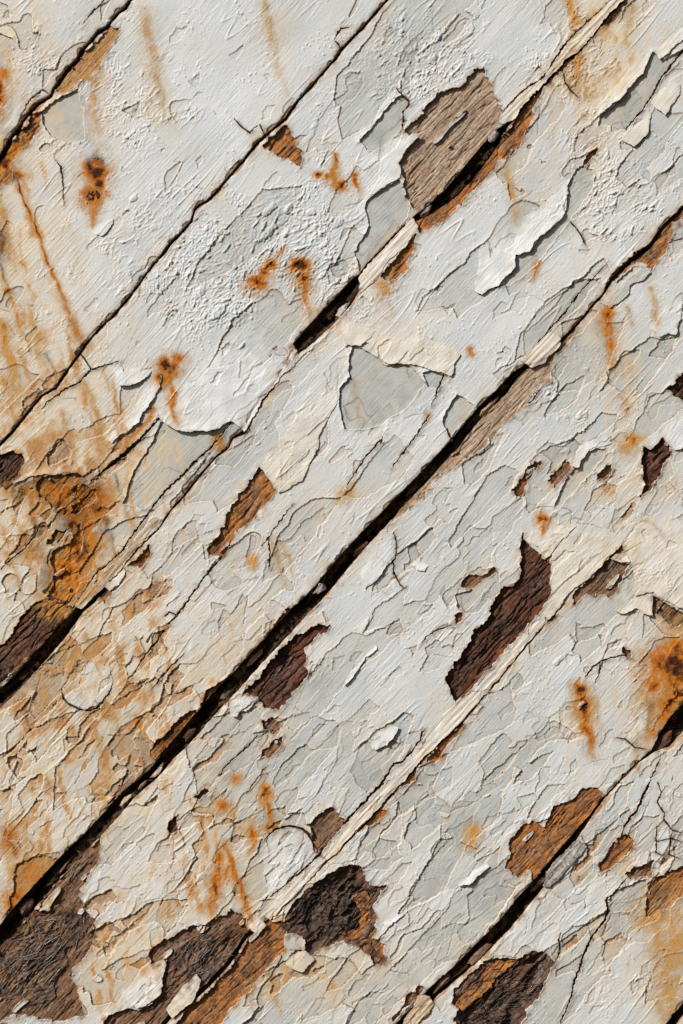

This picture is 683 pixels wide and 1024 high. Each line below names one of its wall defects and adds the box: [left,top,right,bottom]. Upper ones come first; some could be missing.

rust [78,159,109,228]
peeling [343,57,575,281]
rust [246,246,311,314]
rust [154,353,184,425]
crack [61,556,222,711]
crack [79,418,231,598]
peeling [228,624,330,758]
peeling [445,416,683,701]
rust [638,632,683,739]
crack [259,731,424,911]
crack [616,737,681,859]
peeling [0,837,101,1022]